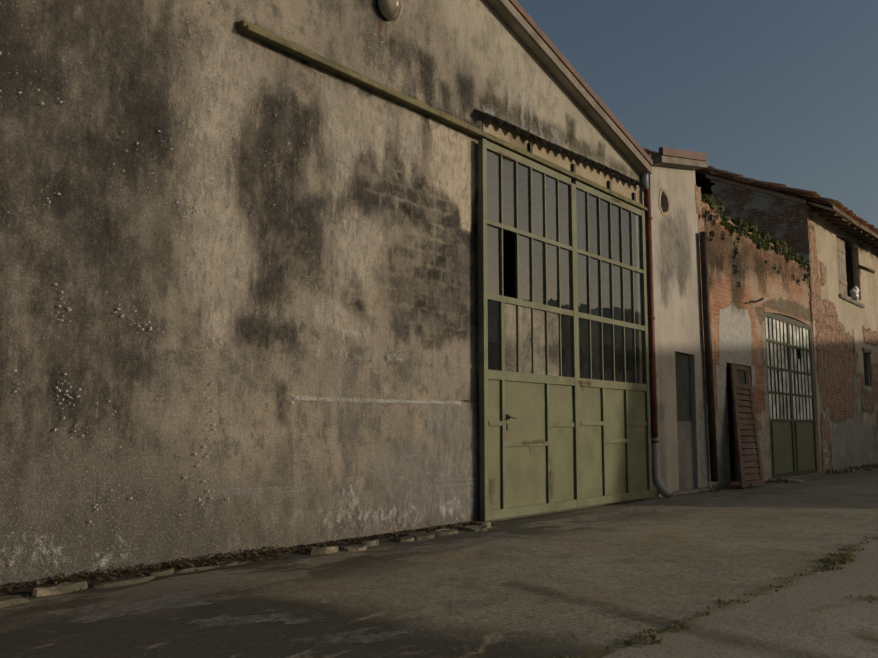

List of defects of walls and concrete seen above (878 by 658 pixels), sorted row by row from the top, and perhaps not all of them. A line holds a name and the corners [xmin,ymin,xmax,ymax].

water stain [0,0,66,110]
water stain [43,0,176,421]
water stain [181,0,601,347]
spalling [809,224,878,473]